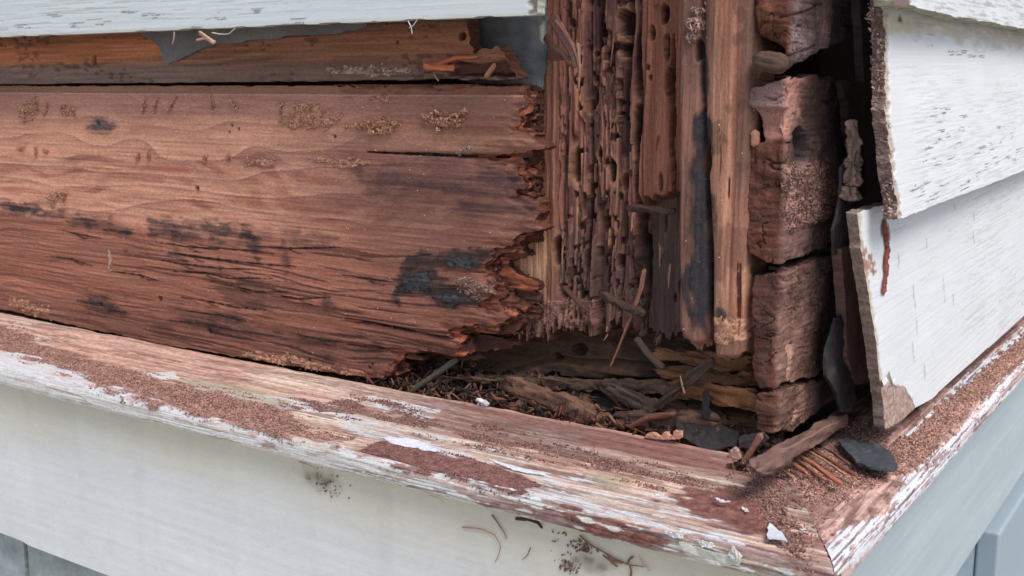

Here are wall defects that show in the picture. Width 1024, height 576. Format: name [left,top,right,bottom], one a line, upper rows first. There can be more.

crack [369,150,494,158]
water stain [2,203,133,235]
water stain [147,218,270,261]
water stain [681,54,726,329]
rust [863,218,891,295]
peeling [880,372,915,429]
peeling [361,437,546,492]
peeling [560,504,743,566]
peeling [654,487,788,542]